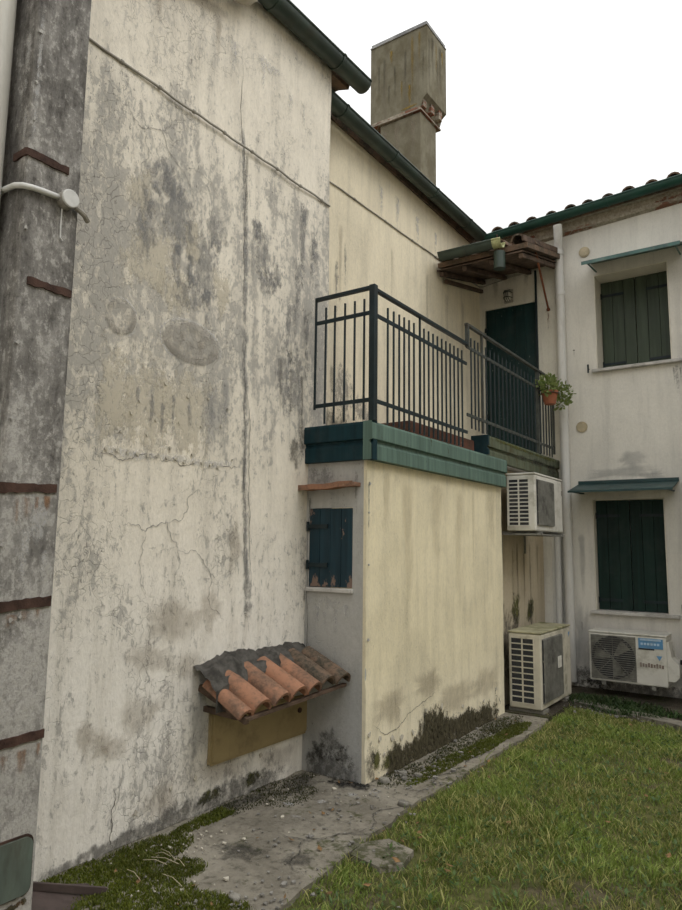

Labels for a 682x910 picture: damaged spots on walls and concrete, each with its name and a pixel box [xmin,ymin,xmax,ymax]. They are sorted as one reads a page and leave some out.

crack [243,346,251,440]
crack [127,490,221,616]
crack [243,463,252,631]
water stain [288,733,375,791]